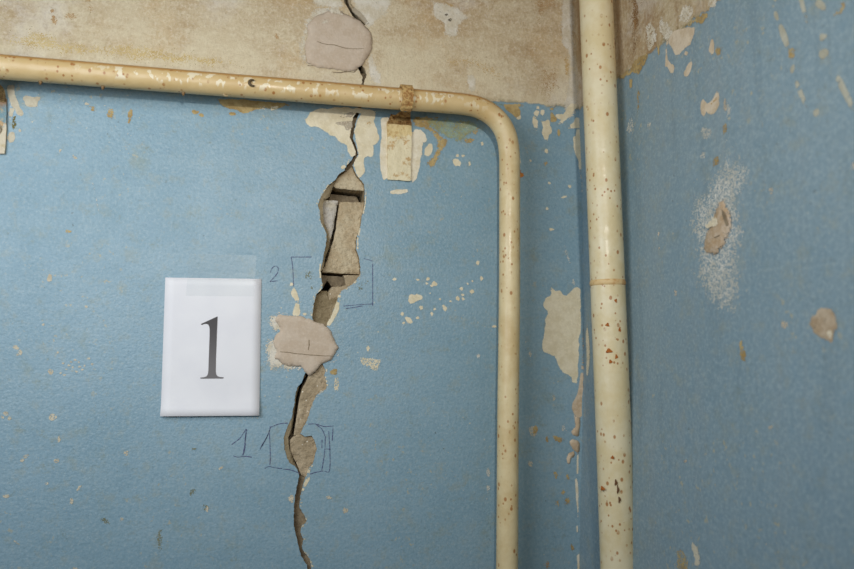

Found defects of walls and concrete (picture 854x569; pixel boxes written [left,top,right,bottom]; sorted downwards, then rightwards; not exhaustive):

crack [344,0,367,25]
peeling [7,85,40,143]
crack [317,41,364,73]
peeling [532,0,581,176]
peeling [620,0,716,109]
peeling [390,117,483,194]
flaking render [290,107,389,327]
peeling [401,276,484,324]
flaking render [810,308,837,343]
peeling [542,279,590,513]
crack [280,344,328,569]